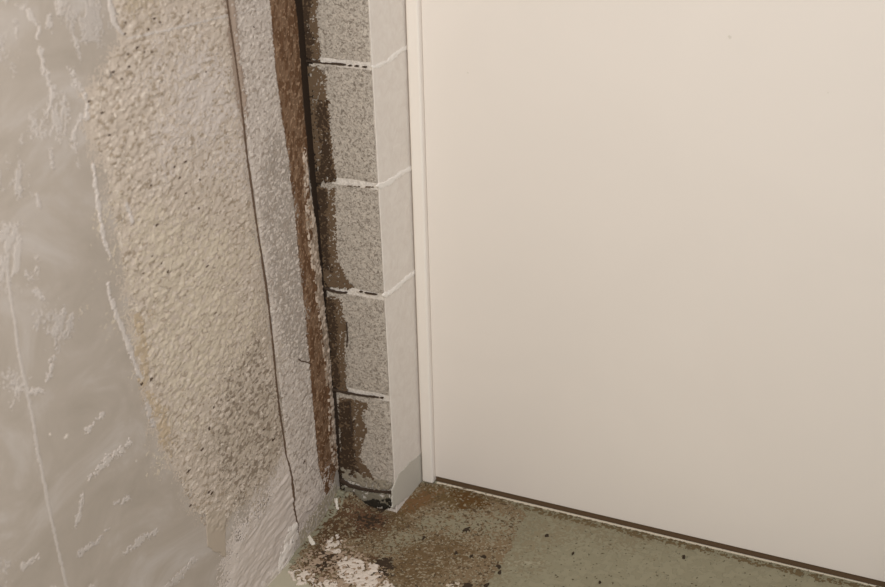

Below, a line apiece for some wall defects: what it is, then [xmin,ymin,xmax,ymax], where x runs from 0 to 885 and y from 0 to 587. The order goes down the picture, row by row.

damp [0,221,93,411]
damp [75,0,310,537]
crack [226,0,299,533]
crack [295,0,377,364]
crack [332,388,384,444]
crack [338,470,392,494]
damp [261,0,882,587]